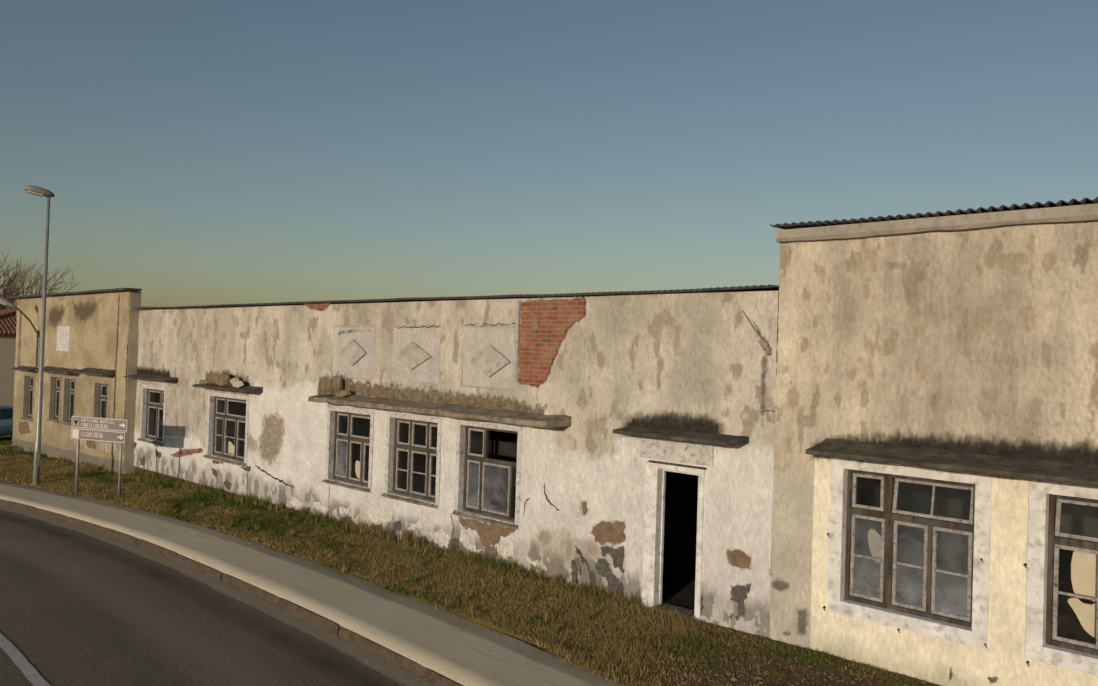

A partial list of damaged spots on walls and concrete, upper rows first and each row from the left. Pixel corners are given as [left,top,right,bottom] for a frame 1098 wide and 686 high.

flaking render [518,297,586,388]
flaking render [134,442,202,465]
peeling [212,460,231,491]
flaking render [571,521,625,598]
spalling [727,550,751,568]
peeling [730,584,751,620]